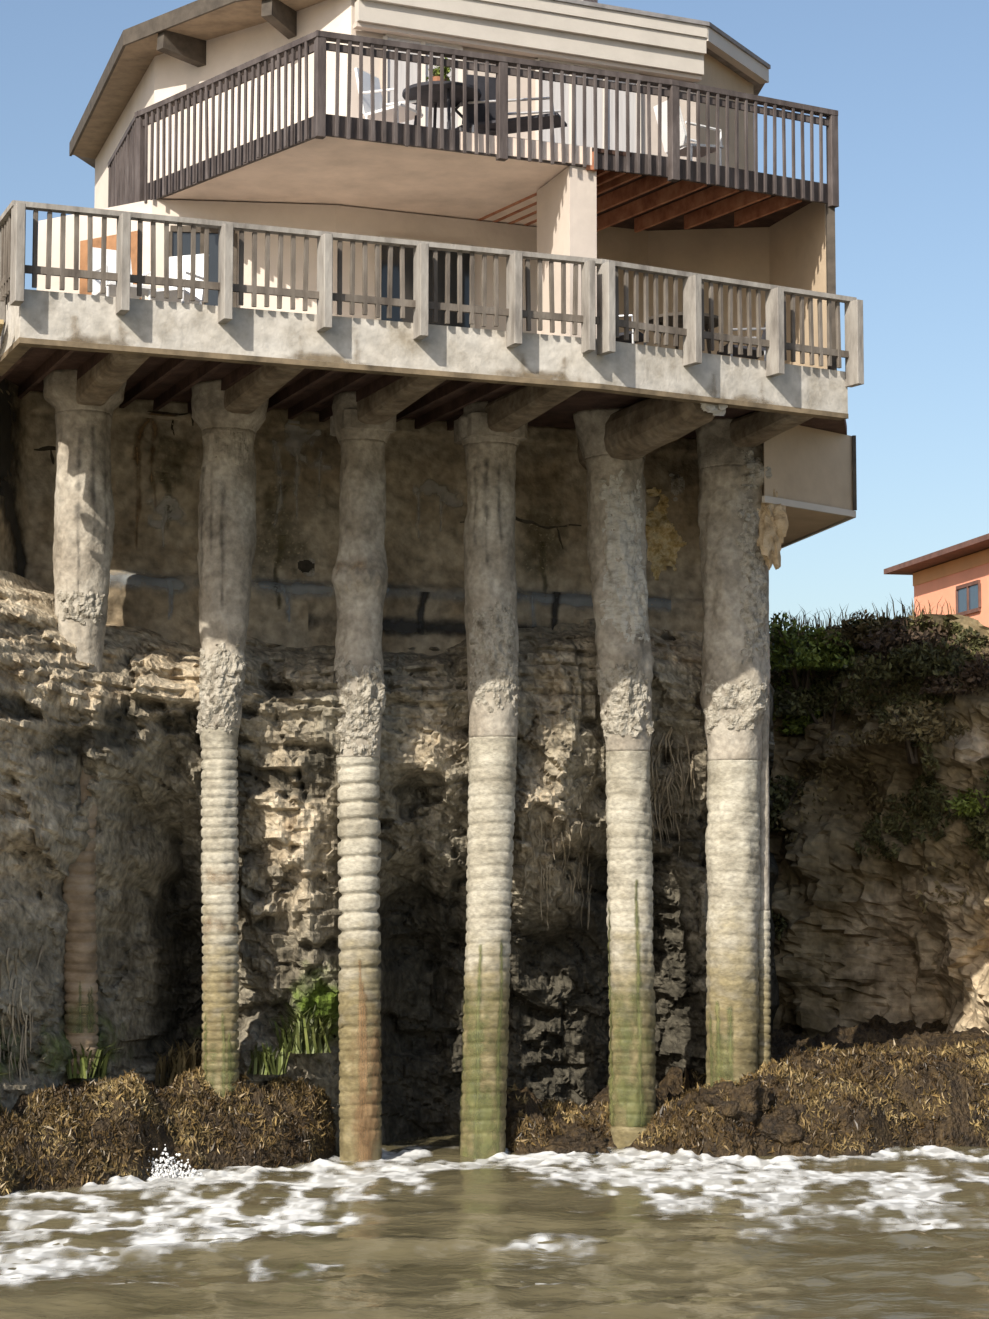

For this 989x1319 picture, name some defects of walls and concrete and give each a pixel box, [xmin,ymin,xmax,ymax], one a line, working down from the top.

spalling [196,641,247,735]
spalling [334,657,387,756]
spalling [469,601,519,716]
spalling [595,470,687,738]
spalling [703,449,789,734]
damp [459,921,482,1159]
damp [635,880,644,1127]